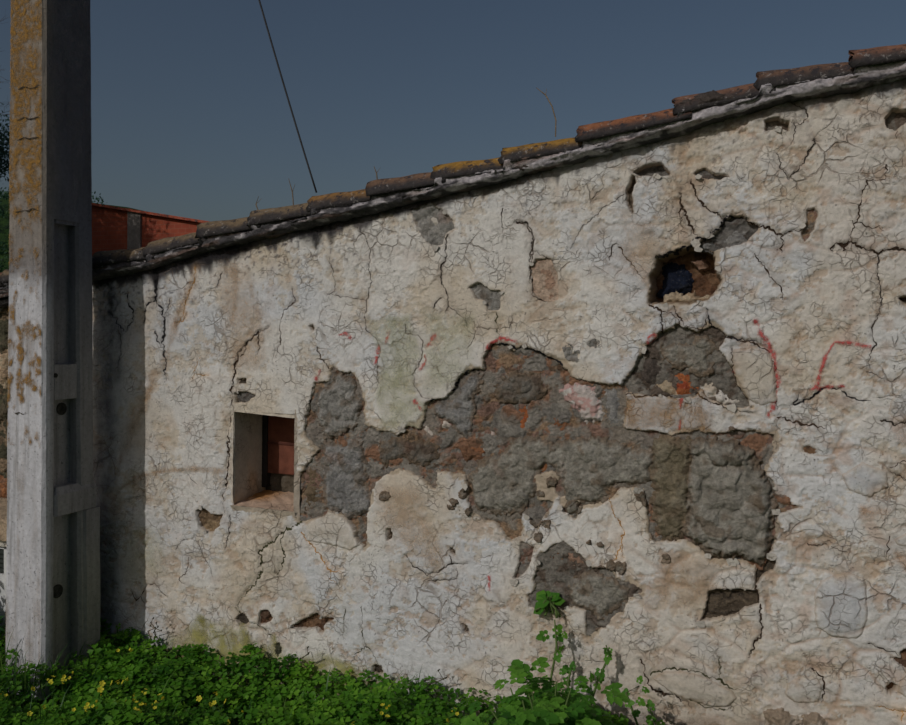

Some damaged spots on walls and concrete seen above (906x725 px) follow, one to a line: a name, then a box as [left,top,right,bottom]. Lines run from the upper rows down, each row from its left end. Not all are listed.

spalling [0,306,9,498]
spalling [198,505,223,533]
crack [222,291,295,546]
spalling [411,203,455,252]
crack [405,234,565,401]
spalling [294,325,799,636]
spalling [656,217,758,307]
crack [655,181,802,259]
crack [649,304,906,429]
crack [830,164,906,379]
crack [640,657,740,711]
spalling [894,649,906,667]